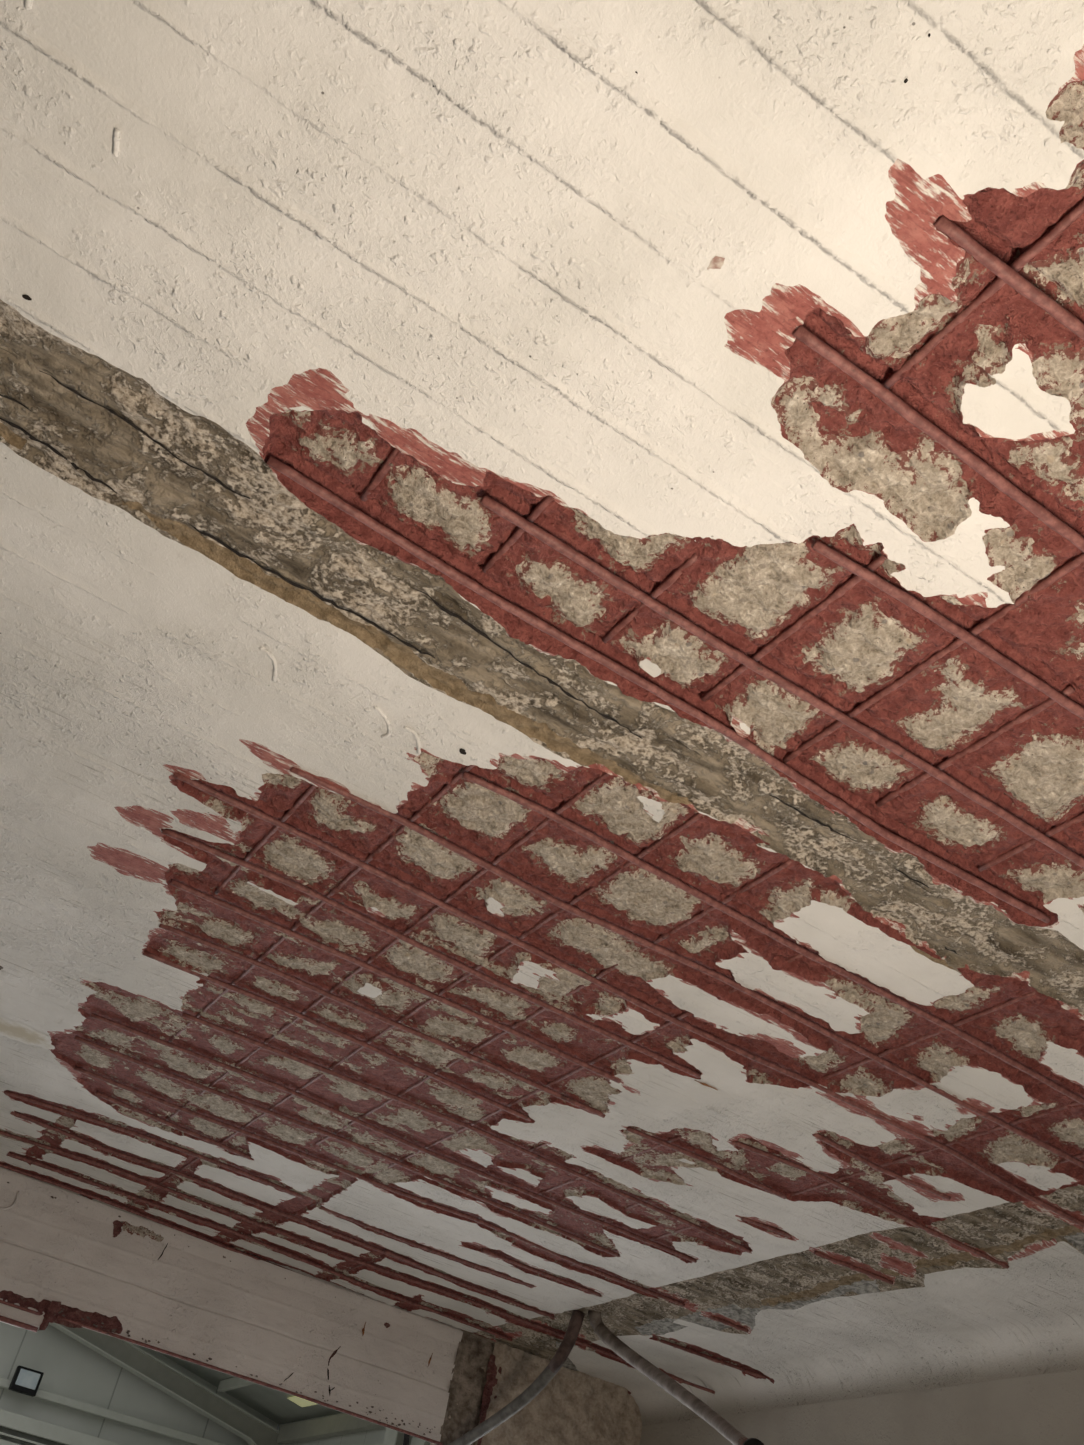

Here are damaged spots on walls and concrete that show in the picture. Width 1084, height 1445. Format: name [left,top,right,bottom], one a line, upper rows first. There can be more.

spalling [1046,44,1084,150]
spalling [724,159,1084,707]
spalling [0,299,1084,1369]